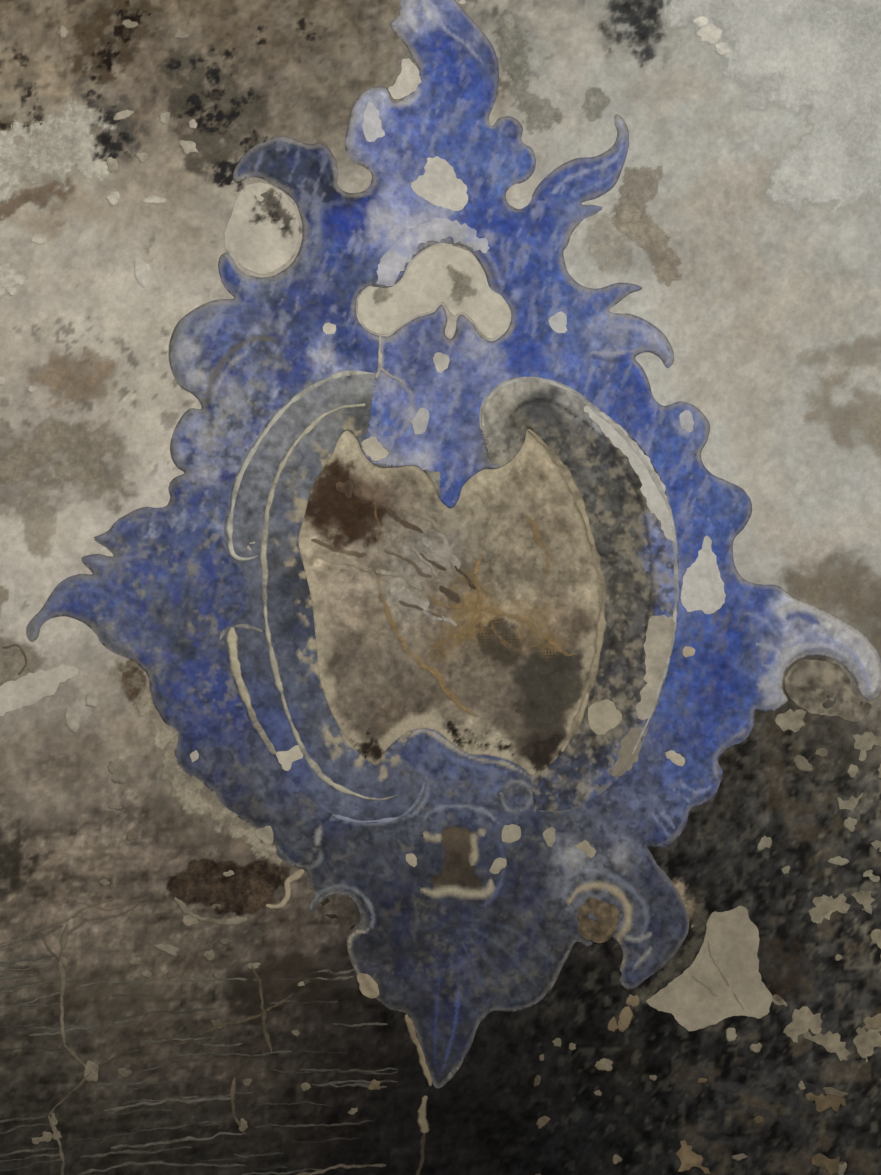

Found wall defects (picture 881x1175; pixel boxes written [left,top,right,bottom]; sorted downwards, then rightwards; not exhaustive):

damp [73,0,154,161]
damp [161,49,266,191]
damp [599,0,664,60]
peeling [224,182,299,274]
peeling [358,156,510,339]
damp [304,459,386,549]
peeling [681,536,726,614]
damp [0,638,43,686]
peeling [588,615,695,777]
spalling [108,658,304,980]
crack [0,904,432,1175]
spalling [607,881,881,1062]